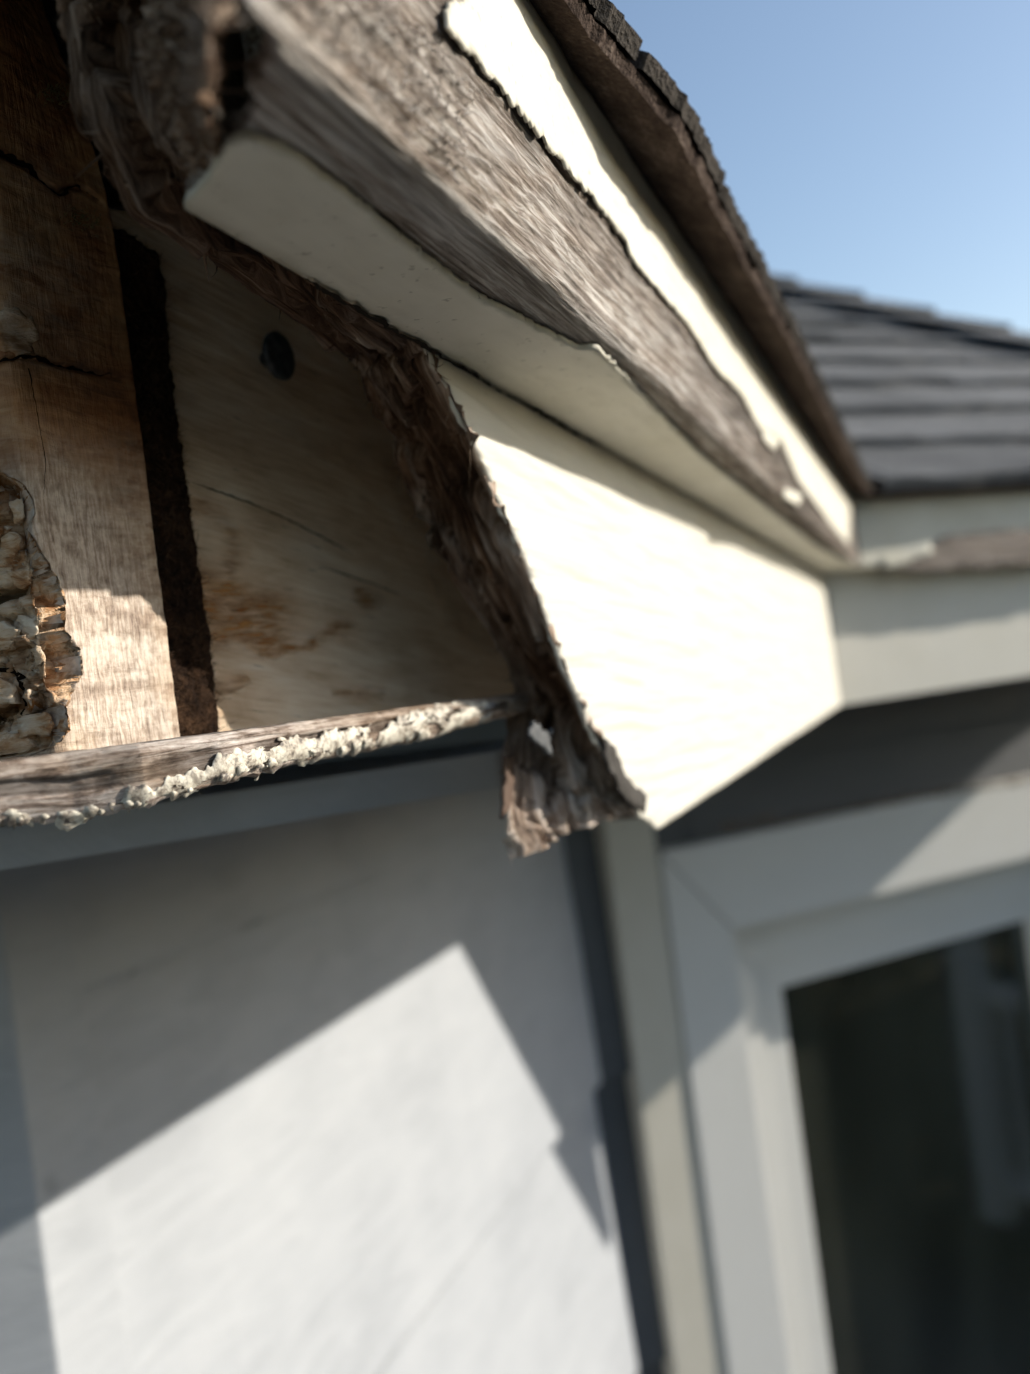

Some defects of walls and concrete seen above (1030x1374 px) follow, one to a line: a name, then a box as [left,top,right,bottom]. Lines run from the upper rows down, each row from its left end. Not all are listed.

crack [0,150,99,201]
peeling [185,0,858,566]
peeling [0,497,32,590]
peeling [877,529,1030,572]
peeling [0,615,46,667]
peeling [0,677,54,756]
peeling [0,699,499,832]
peeling [500,753,516,819]
peeling [528,721,554,756]
peeling [602,738,647,813]